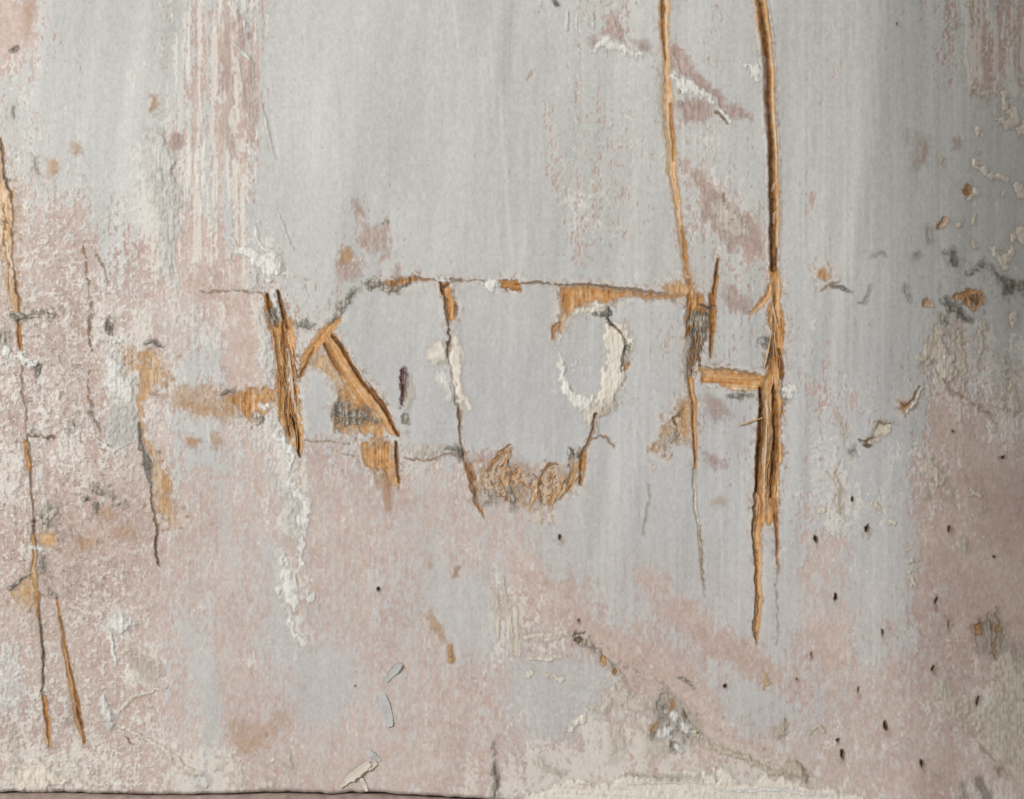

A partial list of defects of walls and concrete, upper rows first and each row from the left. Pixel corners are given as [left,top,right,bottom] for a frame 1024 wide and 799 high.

crack [365,273,695,298]
peeling [937,151,1024,324]
crack [0,138,85,747]
crack [150,487,159,565]
peeling [225,213,414,648]
spalling [465,444,586,511]